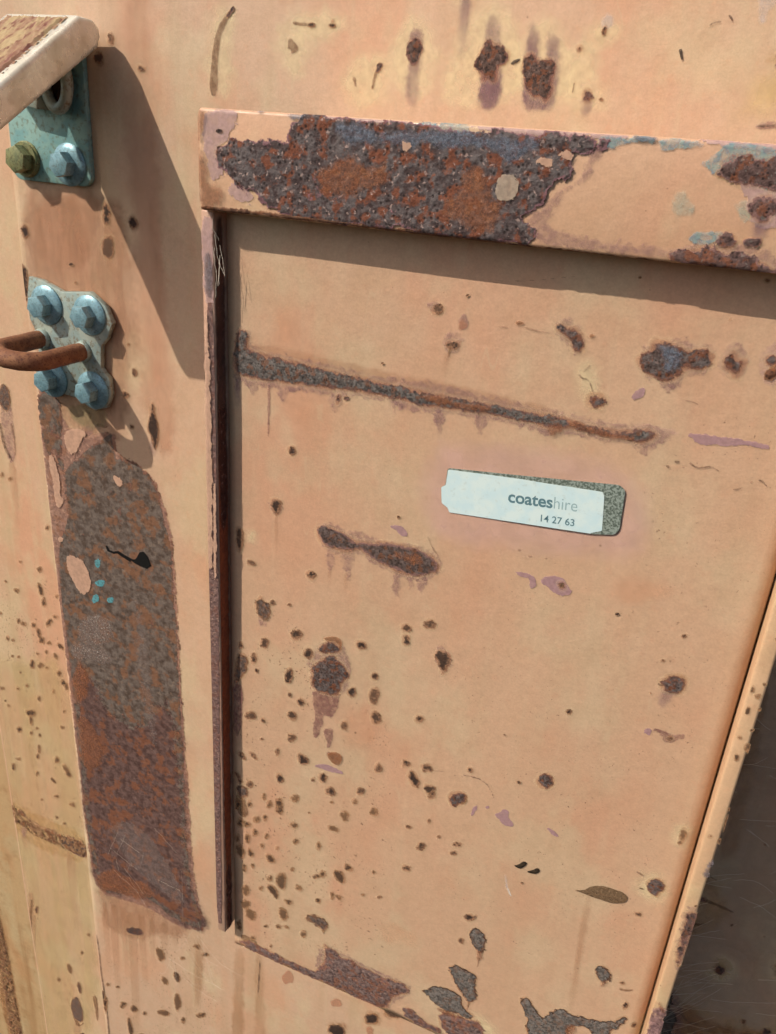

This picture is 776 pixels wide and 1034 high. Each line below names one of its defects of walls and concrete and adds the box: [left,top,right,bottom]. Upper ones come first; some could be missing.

corrosion [405,35,423,68]
corrosion [522,40,556,109]
corrosion [101,204,114,259]
corrosion [662,142,776,273]
corrosion [639,341,711,381]
corrosion [724,354,744,376]
corrosion [764,354,776,381]
corrosion [0,384,10,411]
corrosion [0,390,218,1034]
corrosion [676,897,733,966]